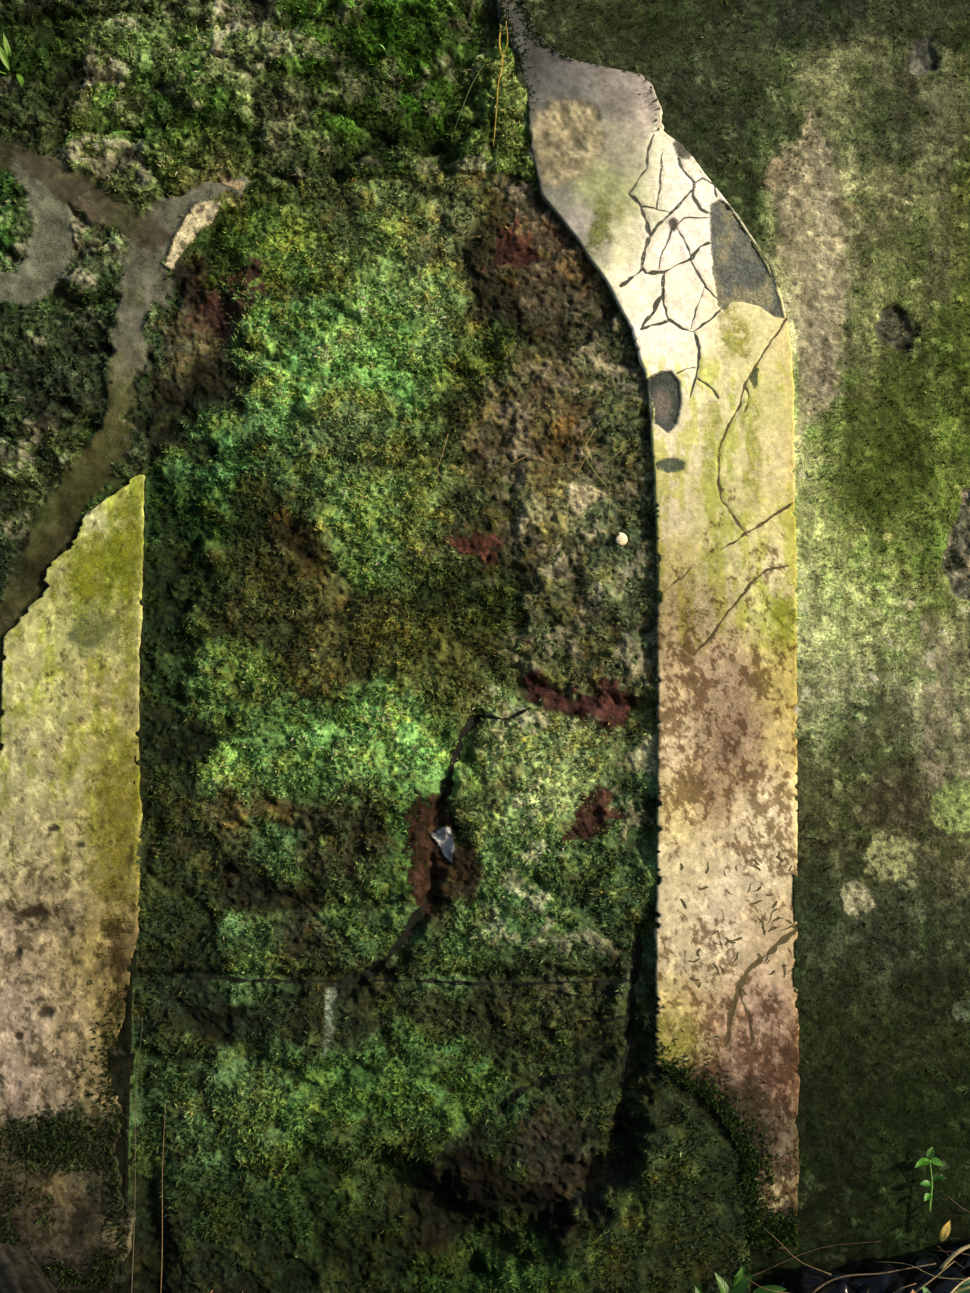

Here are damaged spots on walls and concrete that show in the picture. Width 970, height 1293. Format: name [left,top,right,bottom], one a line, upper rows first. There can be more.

spalling [673,140,692,159]
flaking render [709,105,854,435]
crack [619,135,794,551]
spalling [874,304,918,353]
spalling [648,371,681,433]
spalling [656,458,685,473]
spalling [942,488,970,601]
crack [692,565,790,656]
spalling [521,668,647,738]
crack [439,707,531,805]
spalling [561,784,626,845]